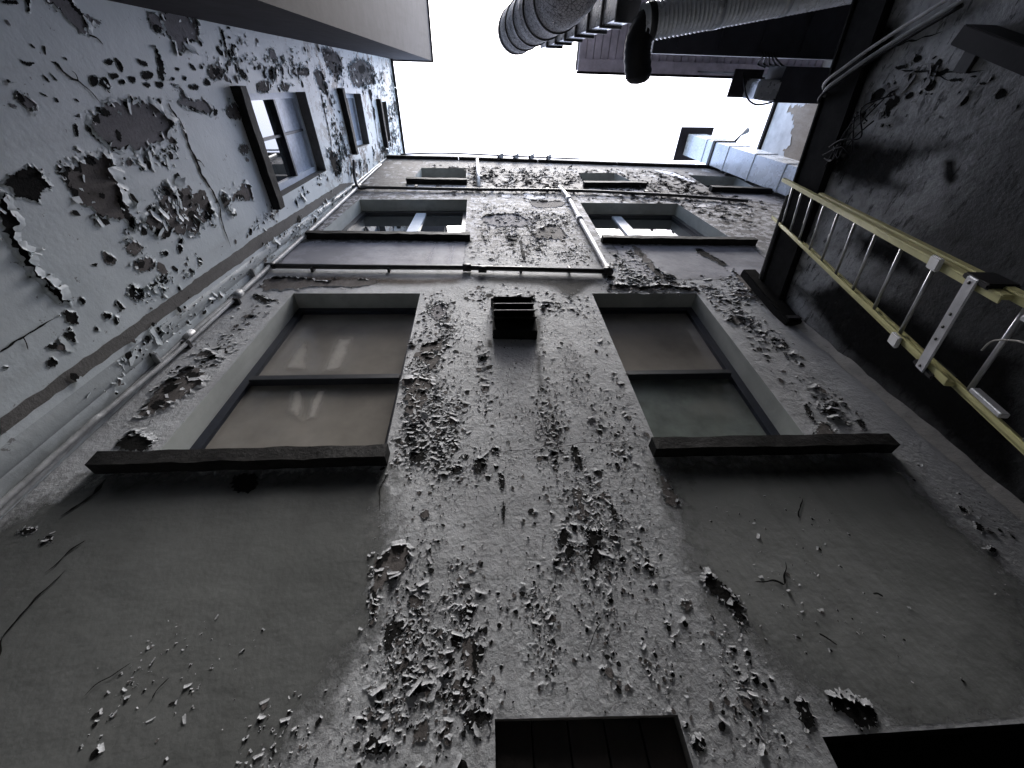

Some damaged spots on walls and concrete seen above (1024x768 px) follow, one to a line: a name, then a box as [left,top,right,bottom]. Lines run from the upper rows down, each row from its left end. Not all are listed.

peeling [0,0,102,38]
crack [0,318,55,352]
peeling [0,9,402,451]
peeling [428,165,868,434]
peeling [236,283,879,768]
crack [0,541,84,655]
peeling [78,620,188,759]
peeling [168,663,201,724]